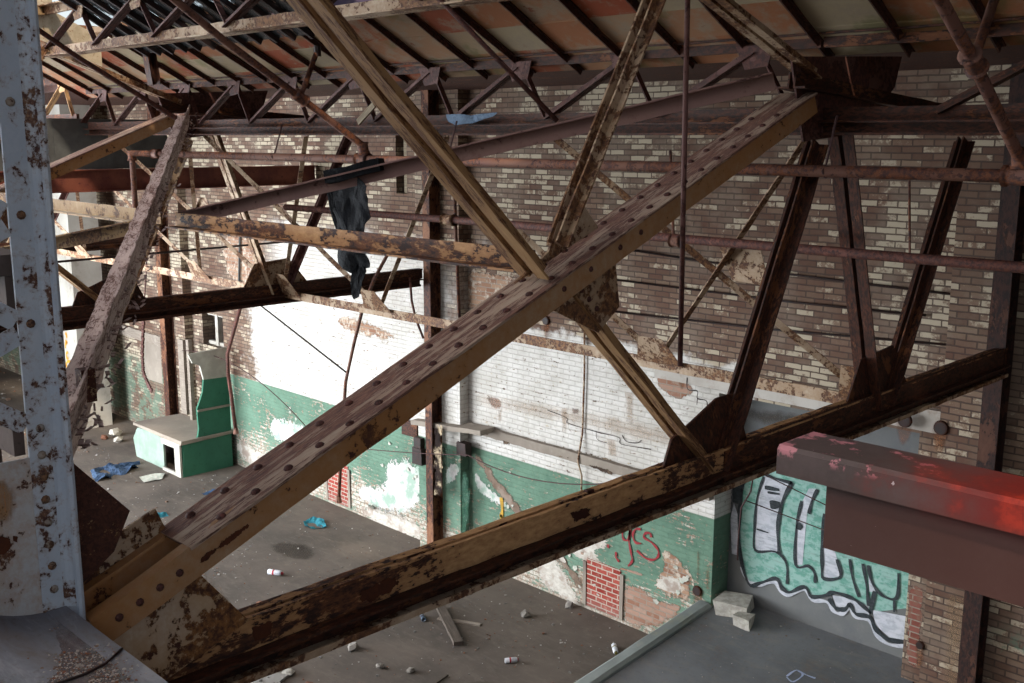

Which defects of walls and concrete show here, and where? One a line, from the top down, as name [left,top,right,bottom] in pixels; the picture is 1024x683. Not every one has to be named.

peeling [358,442,420,540]
peeling [433,425,459,495]
peeling [475,473,513,509]
flaking render [620,550,702,627]